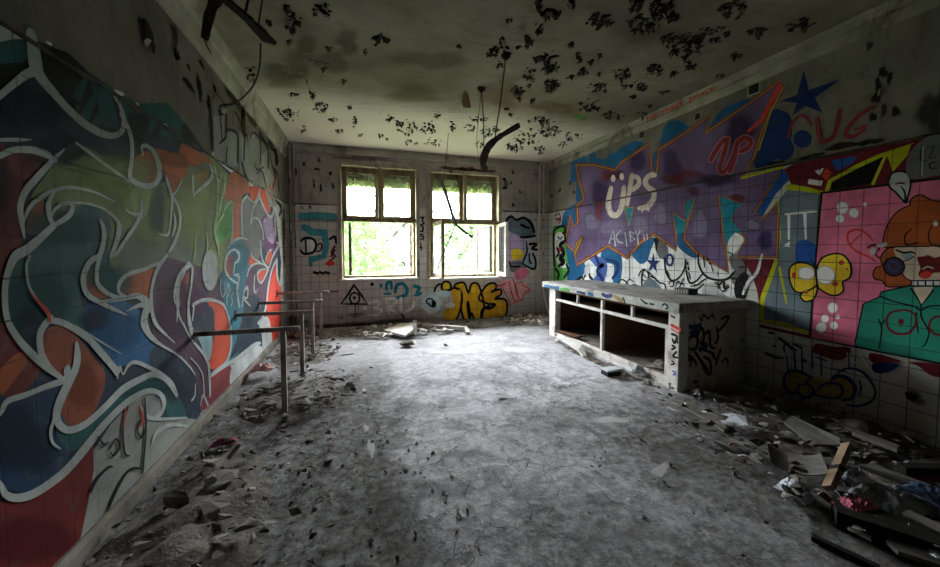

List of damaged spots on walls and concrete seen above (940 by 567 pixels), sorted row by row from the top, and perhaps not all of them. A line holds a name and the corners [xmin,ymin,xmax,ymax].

flaking render [138,16,155,53]
peeling [283,2,332,47]
peeling [363,33,391,56]
peeling [485,0,747,121]
peeling [784,17,818,34]
peeling [170,23,279,166]
peeling [277,91,363,137]
peeling [378,114,501,148]
peeling [506,116,583,154]